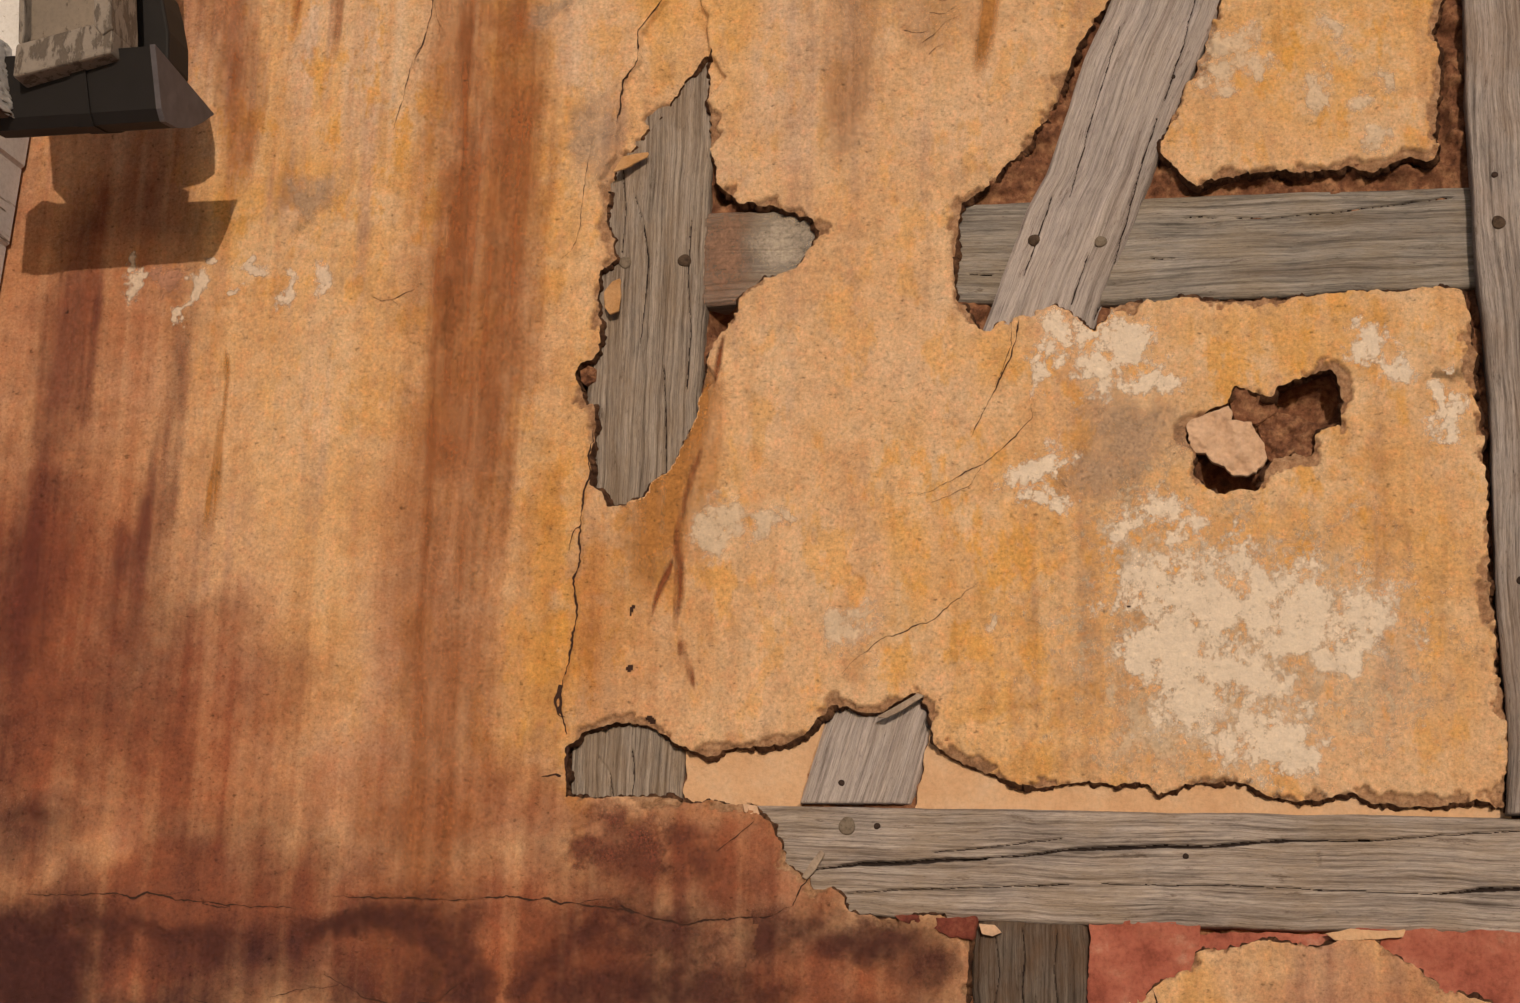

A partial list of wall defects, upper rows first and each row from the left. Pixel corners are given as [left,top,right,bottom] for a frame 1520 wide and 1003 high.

crack [394,0,444,127]
spalling [1156,0,1446,195]
spalling [952,0,1111,331]
water stain [126,251,217,325]
spalling [575,49,713,507]
corrosion [205,453,221,515]
crack [542,428,594,791]
peeling [564,283,1507,888]
crack [34,891,291,908]
water stain [510,904,699,1003]
water stain [571,809,711,875]
water stain [753,914,947,974]